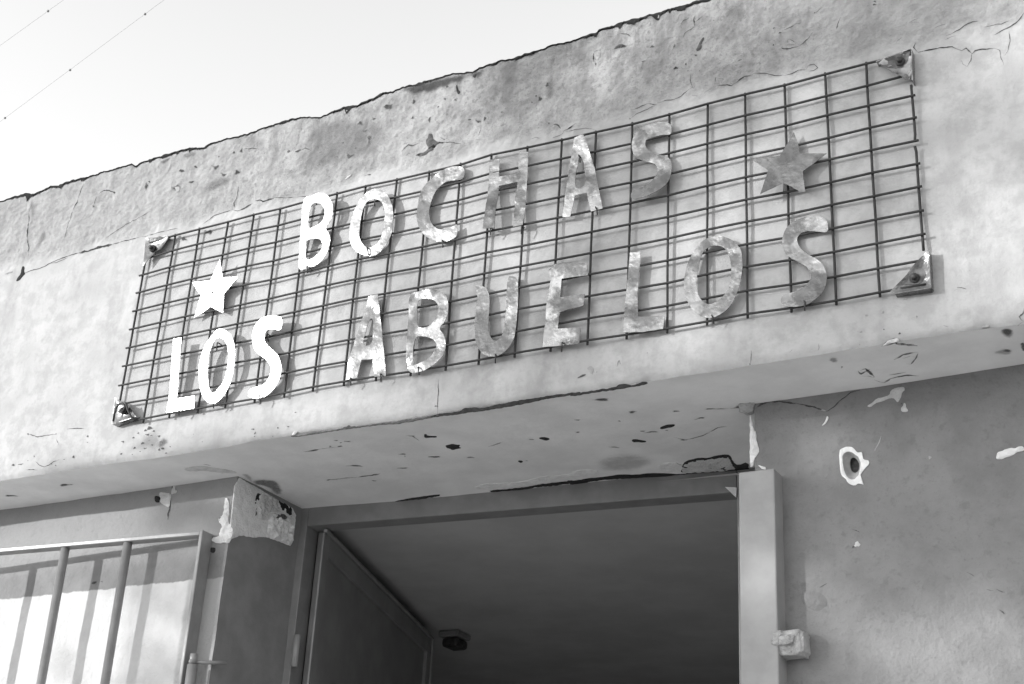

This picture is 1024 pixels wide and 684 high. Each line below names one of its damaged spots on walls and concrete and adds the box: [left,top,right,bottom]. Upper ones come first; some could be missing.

crack [900,13,1024,66]
flaking render [416,117,442,156]
crack [25,183,177,273]
crack [737,353,918,411]
flaking render [184,464,296,553]
crack [395,494,440,502]
peeling [413,434,474,458]
peeling [474,469,599,490]
crack [490,473,685,492]
flaking render [658,415,766,474]
spalling [839,447,869,486]
peeling [996,446,1024,459]